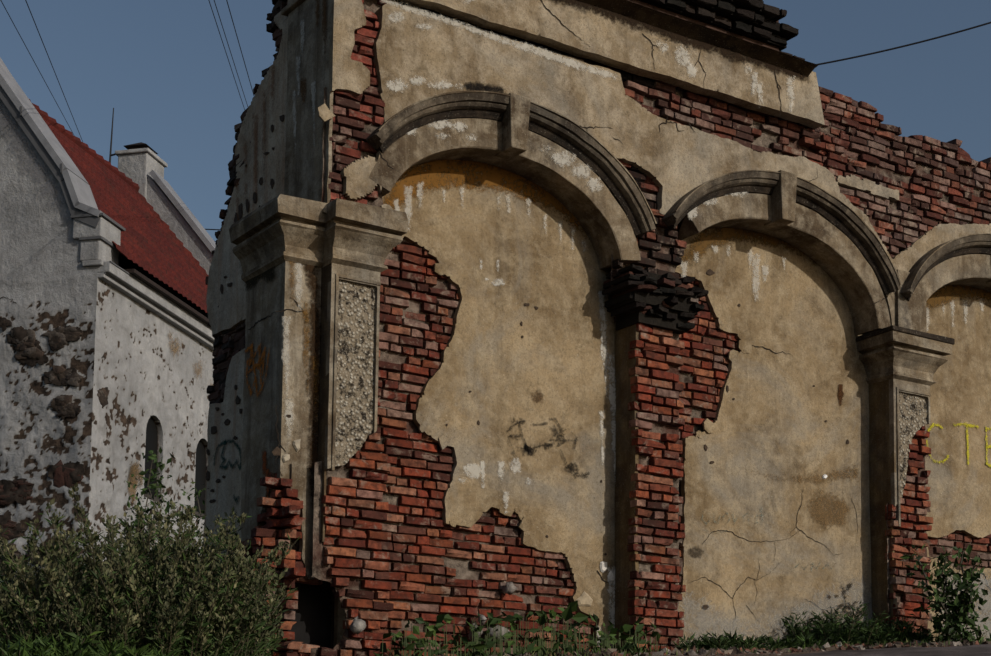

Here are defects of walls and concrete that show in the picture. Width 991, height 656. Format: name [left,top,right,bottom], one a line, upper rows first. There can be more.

spalling [317,0,393,214]
spalling [606,66,991,258]
spalling [0,478,52,572]
spalling [0,316,84,419]
spalling [48,459,85,488]
spalling [239,234,605,656]
peeling [600,553,614,583]
spalling [610,160,752,652]
crack [689,491,858,622]
spalling [885,425,991,635]